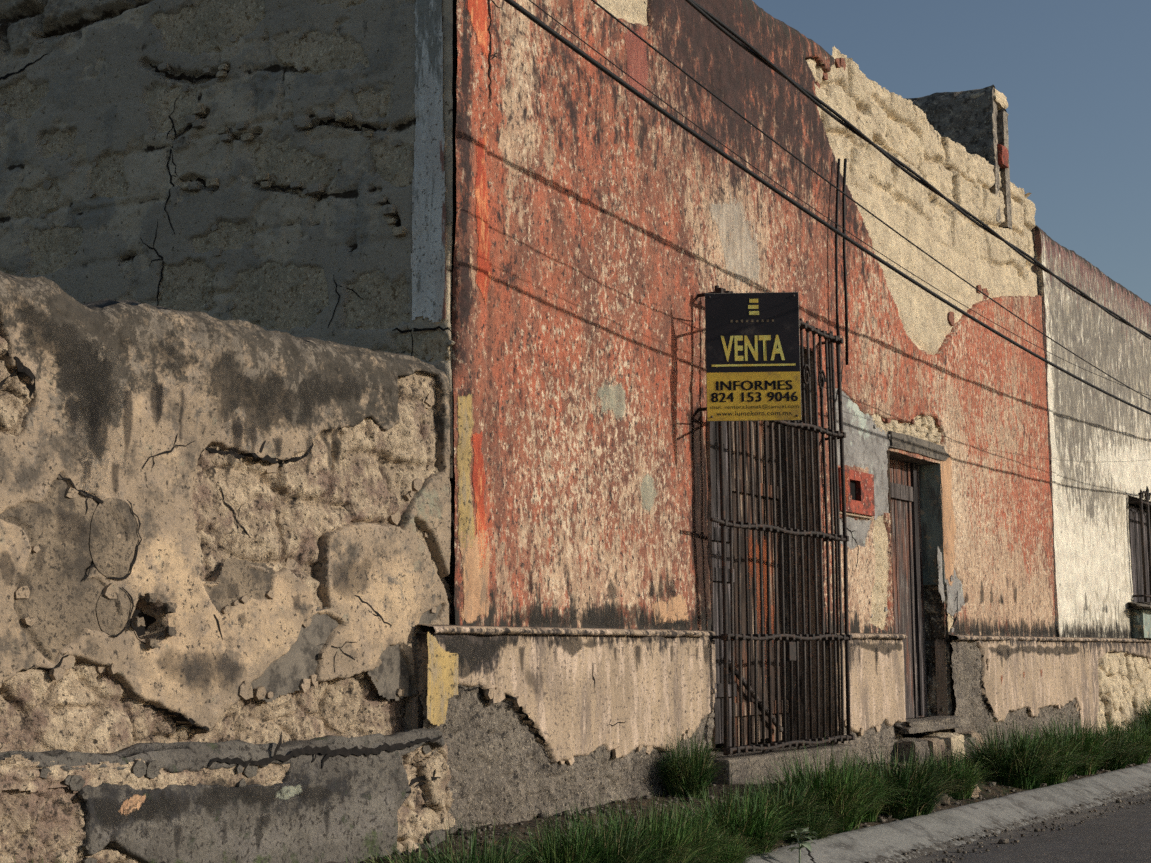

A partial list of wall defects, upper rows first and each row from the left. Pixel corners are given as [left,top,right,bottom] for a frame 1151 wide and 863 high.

crack [0,53,48,80]
crack [141,98,187,306]
spalling [806,46,1038,355]
water stain [210,353,364,438]
crack [142,430,322,469]
crack [218,482,251,538]
spalling [0,270,715,863]
water stain [508,409,711,655]
water stain [446,636,516,677]
spalling [943,613,1081,751]
spalling [1097,650,1151,734]
water stain [95,780,341,827]